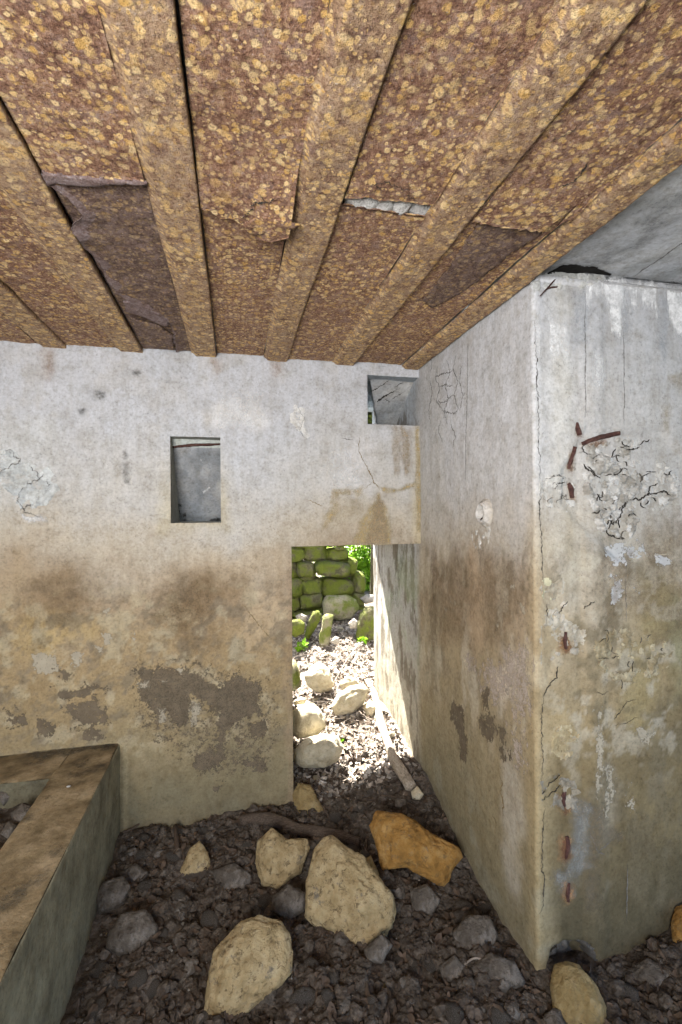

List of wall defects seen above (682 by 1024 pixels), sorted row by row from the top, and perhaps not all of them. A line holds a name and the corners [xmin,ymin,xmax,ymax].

peeling [0,449,60,522]
crack [428,355,468,472]
crack [534,319,543,580]
spalling [539,422,681,605]
crack [538,811,546,914]